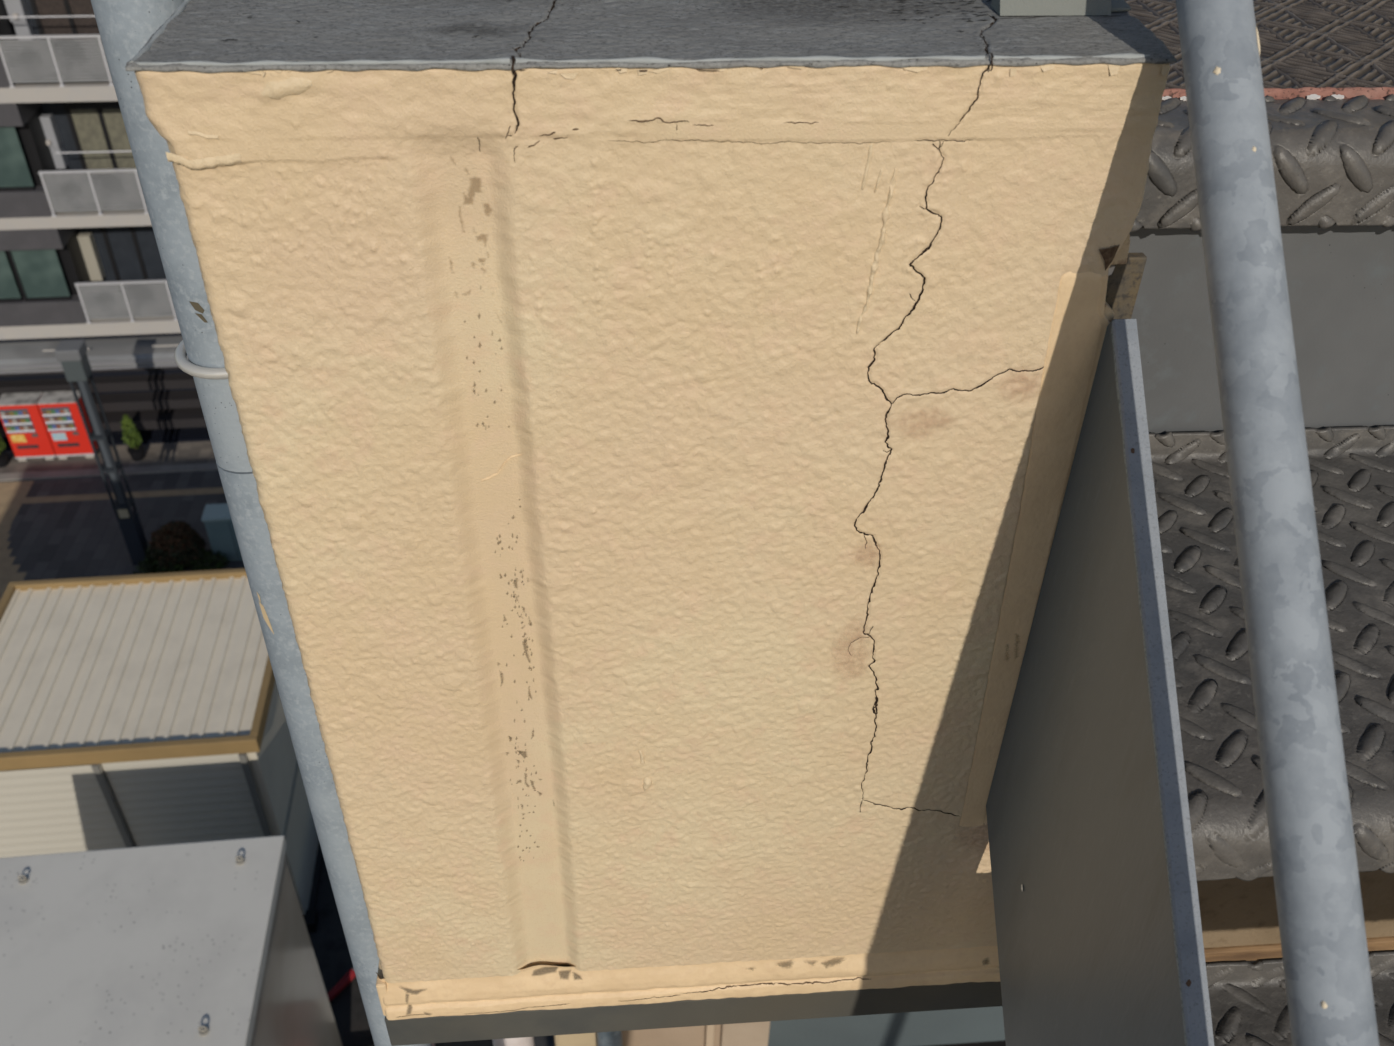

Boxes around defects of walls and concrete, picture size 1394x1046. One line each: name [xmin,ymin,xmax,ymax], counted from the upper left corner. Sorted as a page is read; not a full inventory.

crack [477,0,579,162]
crack [616,16,1044,816]